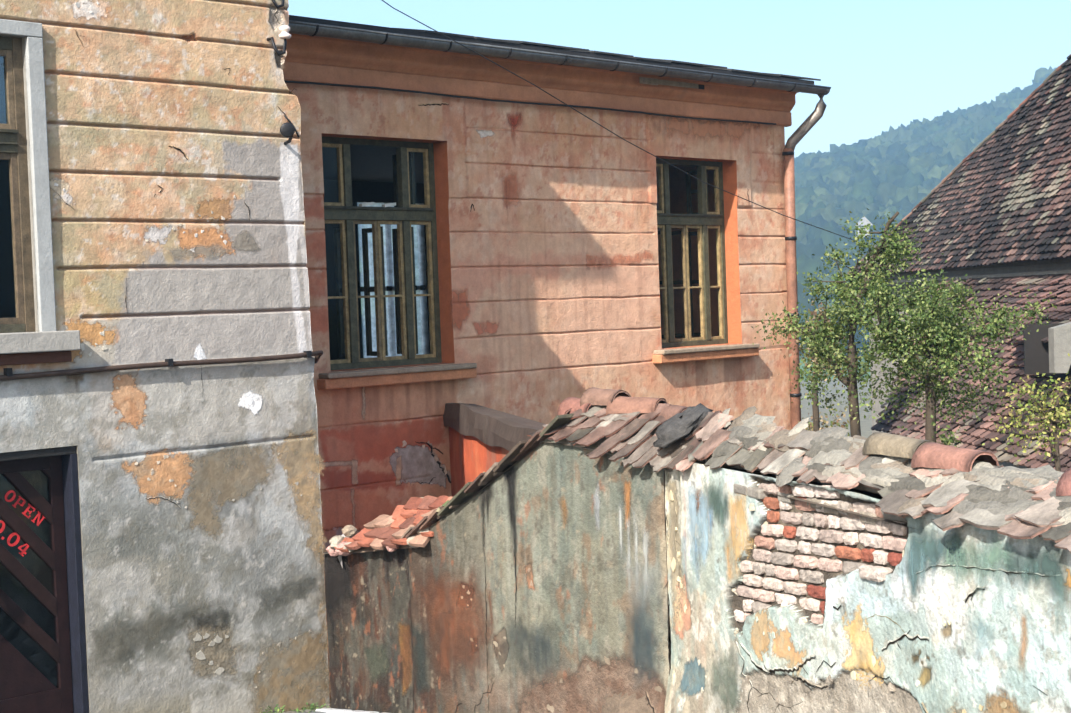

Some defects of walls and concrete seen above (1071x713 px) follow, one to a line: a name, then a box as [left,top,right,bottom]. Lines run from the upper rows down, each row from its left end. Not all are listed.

flaking render [144,195,236,257]
peeling [111,369,147,430]
flaking render [122,430,360,571]
flaking render [729,477,931,713]
leakage [906,530,960,595]
crack [917,564,1047,603]
leakage [1007,549,1063,591]
leakage [97,606,227,658]
flaking render [518,656,666,713]
peeling [679,657,707,696]
crack [864,614,930,713]
flaking render [979,690,1020,713]